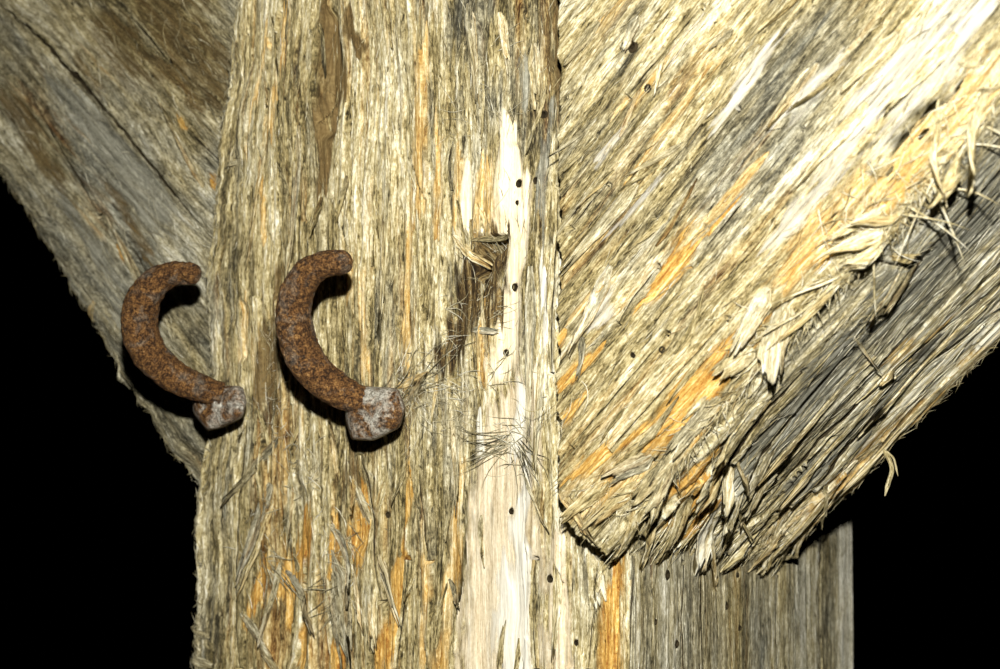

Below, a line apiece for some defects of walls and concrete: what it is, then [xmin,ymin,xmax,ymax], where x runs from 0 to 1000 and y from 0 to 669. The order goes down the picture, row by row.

crack [0,0,212,243]